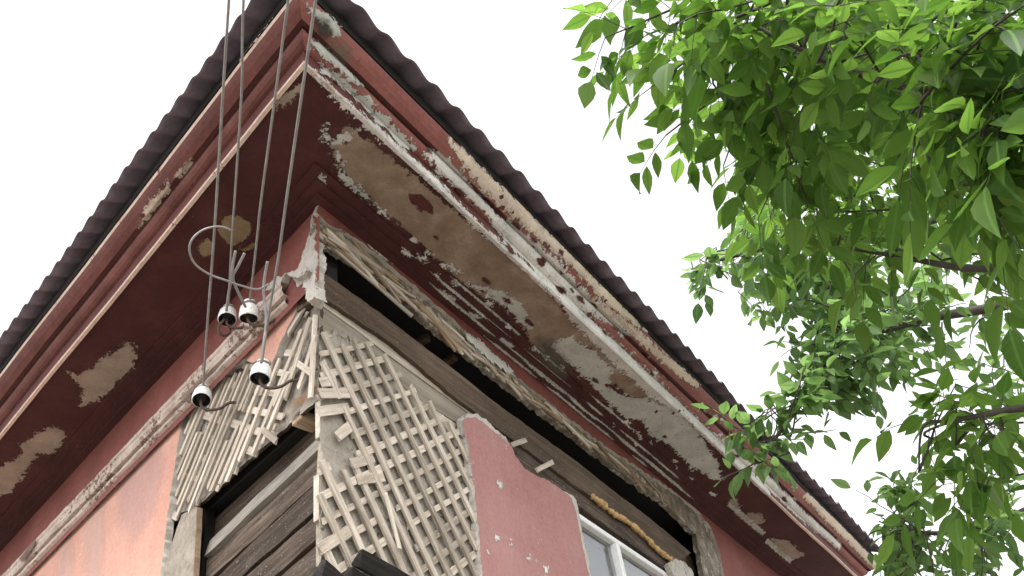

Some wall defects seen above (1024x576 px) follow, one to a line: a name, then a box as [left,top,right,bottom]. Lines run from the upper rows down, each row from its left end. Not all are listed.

peeling [138,158,194,229]
peeling [198,215,255,258]
peeling [271,2,876,570]
peeling [66,342,138,407]
peeling [0,425,67,497]
flaking render [171,307,513,576]